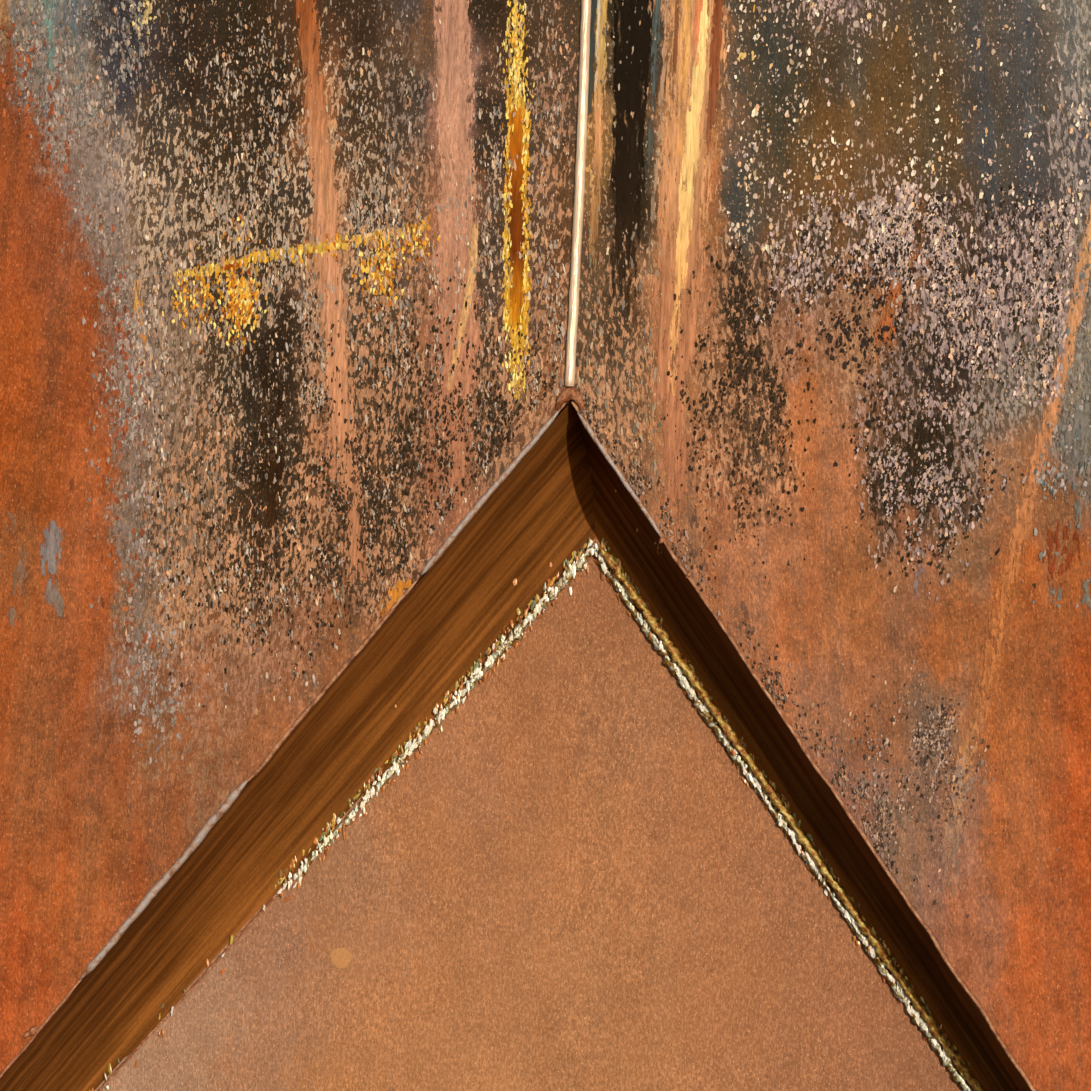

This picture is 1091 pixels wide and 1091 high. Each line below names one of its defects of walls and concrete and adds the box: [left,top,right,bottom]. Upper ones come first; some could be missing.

corrosion [0,21,115,239]
corrosion [61,246,159,649]
peeling [0,0,574,765]
corrosion [1034,519,1088,590]
peeling [739,621,997,905]